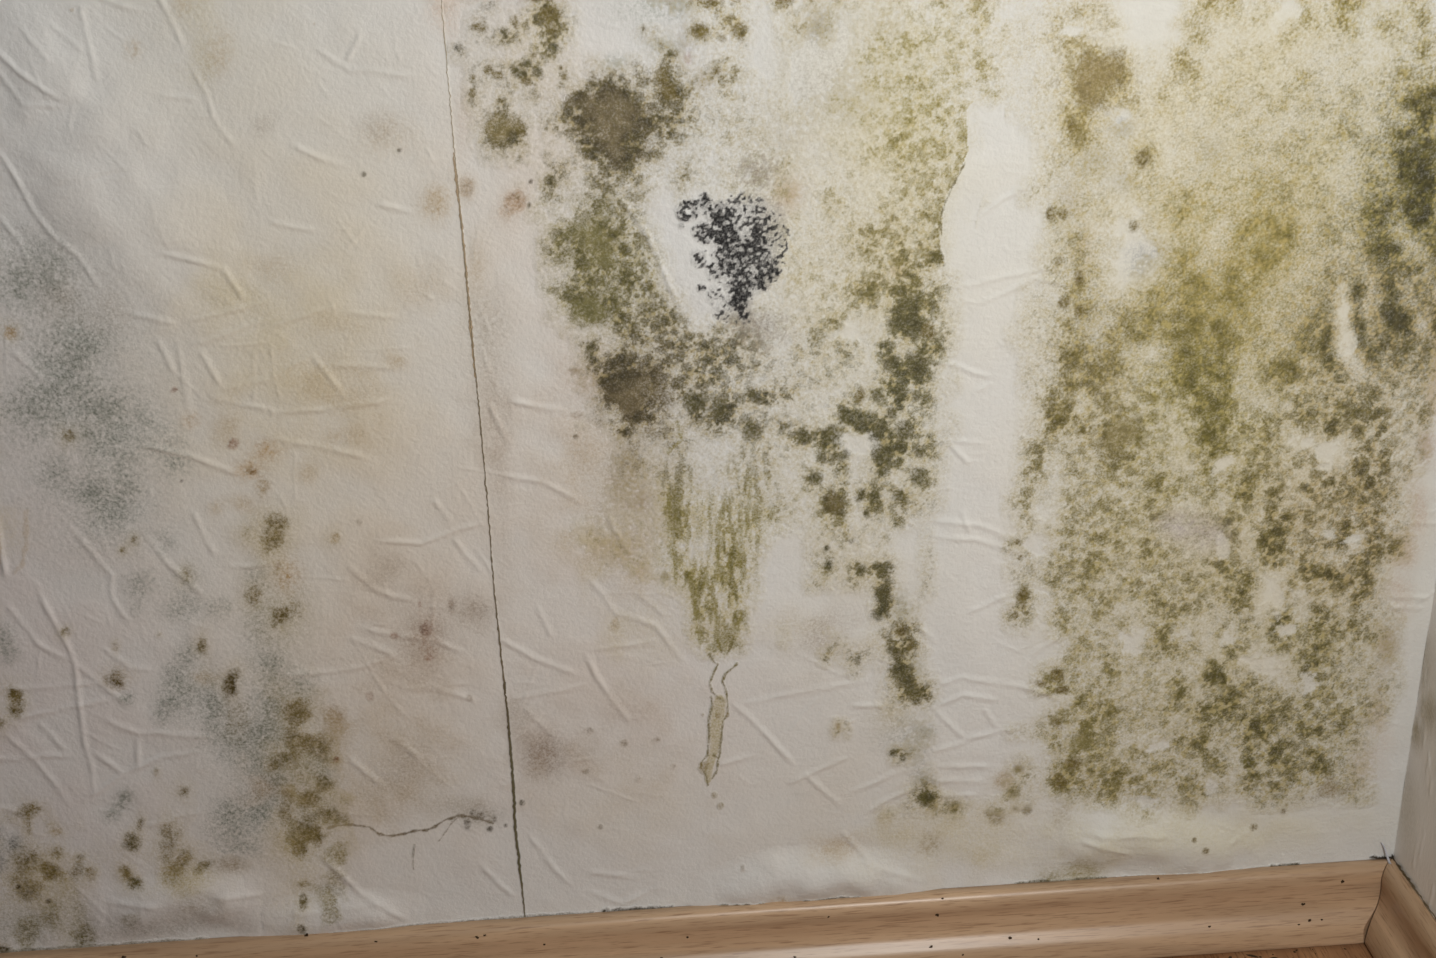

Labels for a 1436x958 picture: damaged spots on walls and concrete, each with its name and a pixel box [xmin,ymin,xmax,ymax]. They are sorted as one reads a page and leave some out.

damp [0,0,968,953]
damp [660,0,1017,358]
damp [755,0,1436,895]